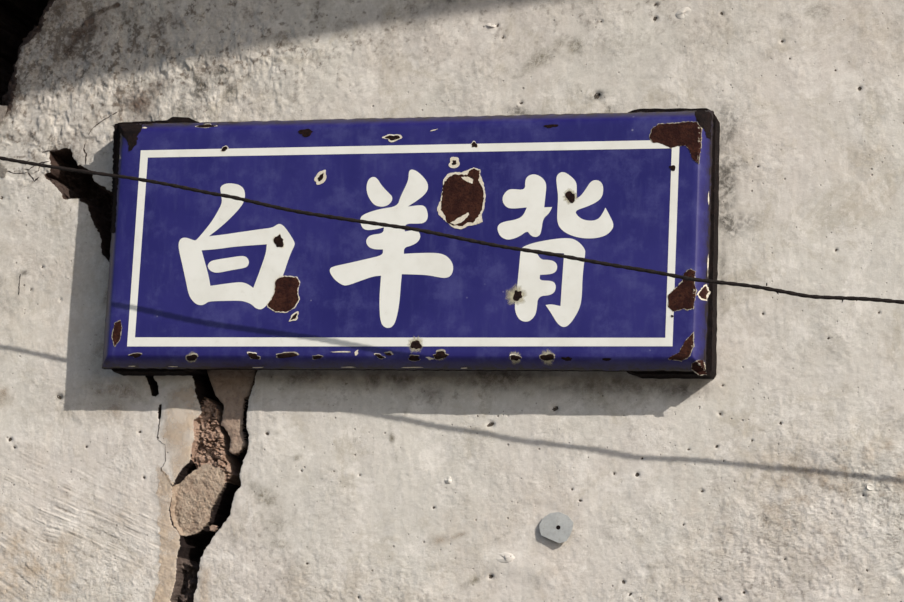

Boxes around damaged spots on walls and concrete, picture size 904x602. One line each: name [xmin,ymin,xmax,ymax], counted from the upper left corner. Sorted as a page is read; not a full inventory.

spalling [0,0,56,124]
crack [8,149,59,182]
crack [83,112,117,164]
crack [145,370,258,602]